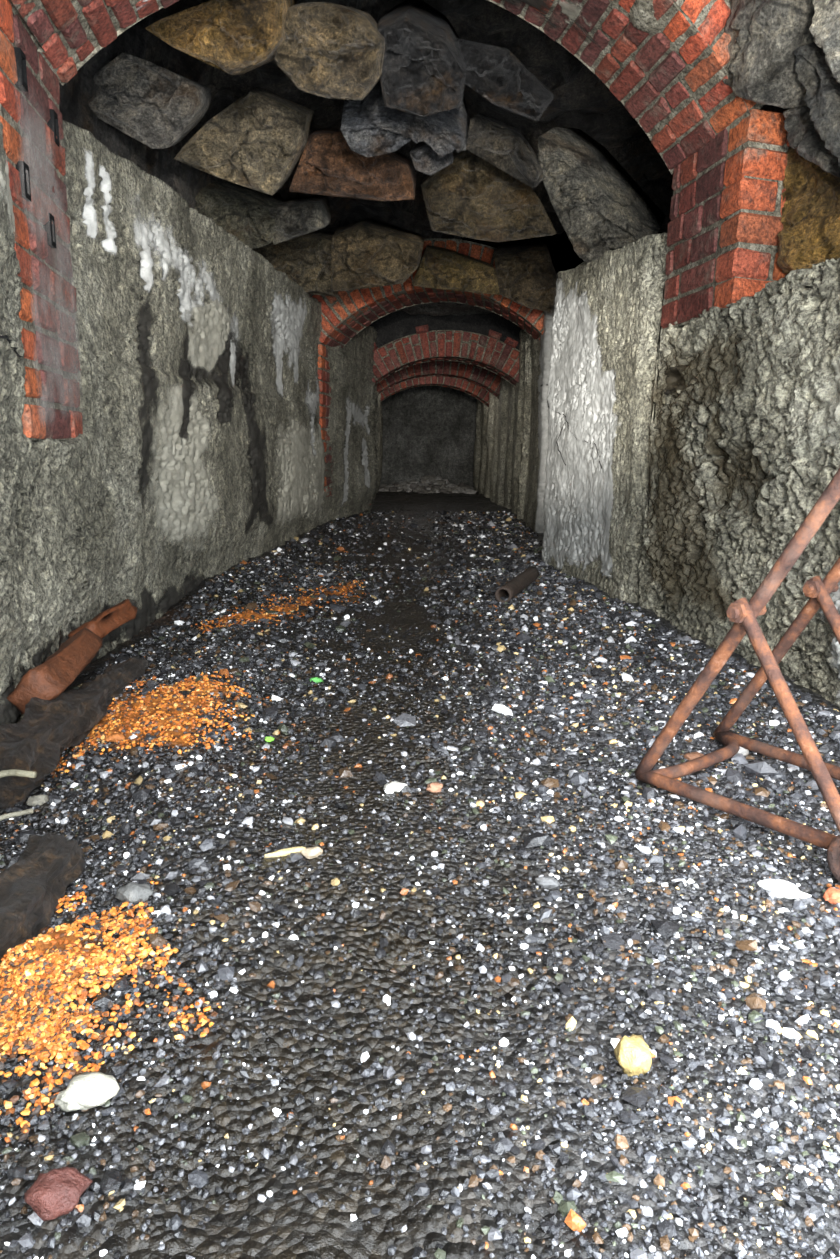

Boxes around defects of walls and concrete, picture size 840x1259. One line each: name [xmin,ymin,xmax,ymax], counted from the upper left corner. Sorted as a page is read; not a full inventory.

damp [82,152,117,253]
crack [0,335,23,358]
damp [134,221,274,533]